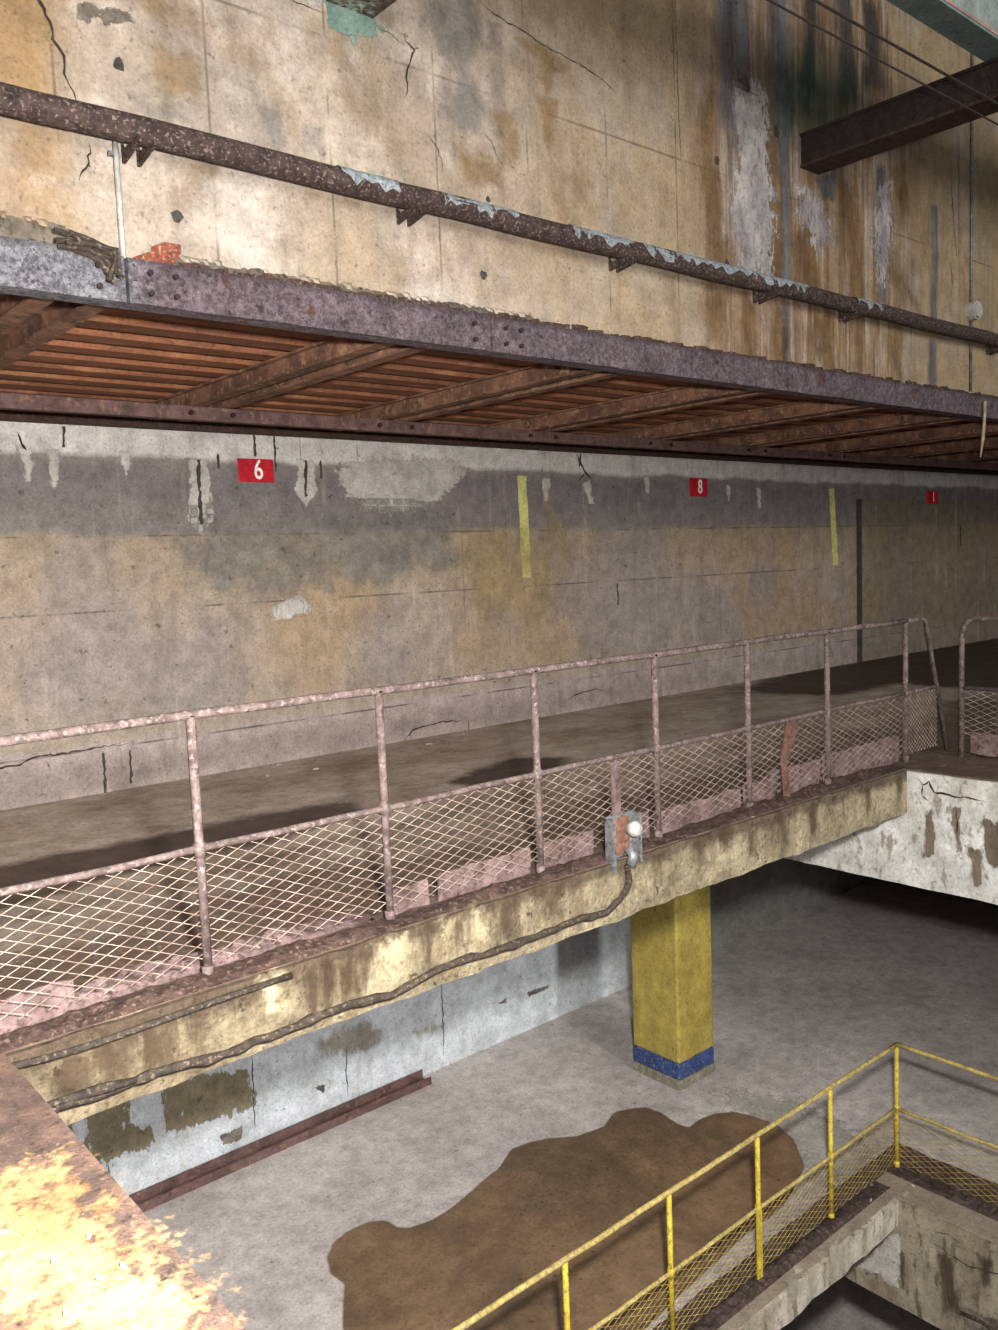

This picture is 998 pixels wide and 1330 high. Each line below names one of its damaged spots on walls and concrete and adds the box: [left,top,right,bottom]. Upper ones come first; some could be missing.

crack [37,0,76,100]
spalling [77,2,134,26]
spalling [0,211,67,244]
rust [700,89,729,264]
rust [758,118,819,288]
water stain [713,0,883,280]
water stain [870,167,897,302]
spalling [272,595,312,620]
peeling [320,1023,381,1052]
peeling [68,1068,257,1167]
rust [0,1141,221,1330]
water stain [328,1083,883,1330]